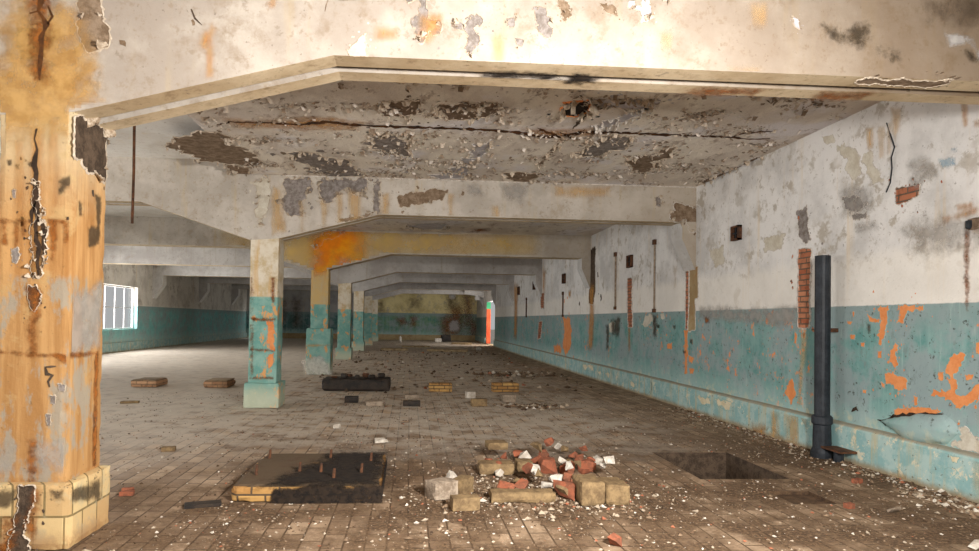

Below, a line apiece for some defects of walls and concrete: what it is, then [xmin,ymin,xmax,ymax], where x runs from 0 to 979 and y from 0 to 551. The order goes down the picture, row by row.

crack [30,0,54,80]
peeling [74,0,126,54]
peeling [346,22,376,57]
peeling [405,0,494,58]
peeling [503,0,573,49]
spalling [844,71,961,91]
crack [219,114,772,140]
crack [30,128,46,276]
peeling [197,80,859,253]
peeling [822,134,925,221]
flaking render [786,204,829,344]
spalling [4,484,45,551]